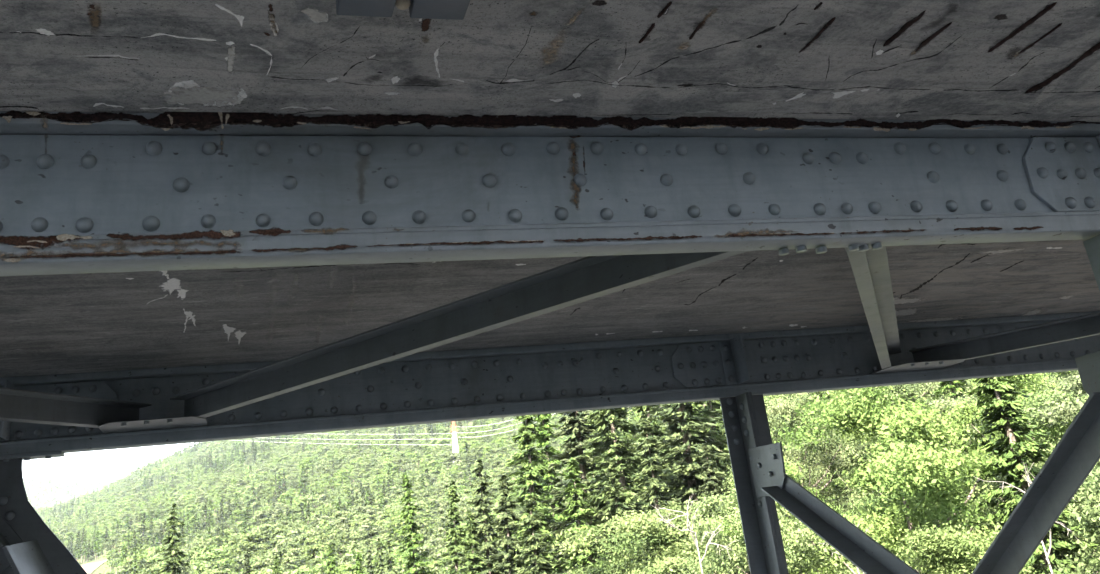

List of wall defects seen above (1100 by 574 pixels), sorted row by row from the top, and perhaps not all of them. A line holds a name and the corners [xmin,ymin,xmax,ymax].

crack [250,4,1100,118]
rust [0,110,1100,209]
rust [0,228,702,262]
crack [672,258,757,305]
rust [715,229,925,237]
crack [893,243,1024,299]